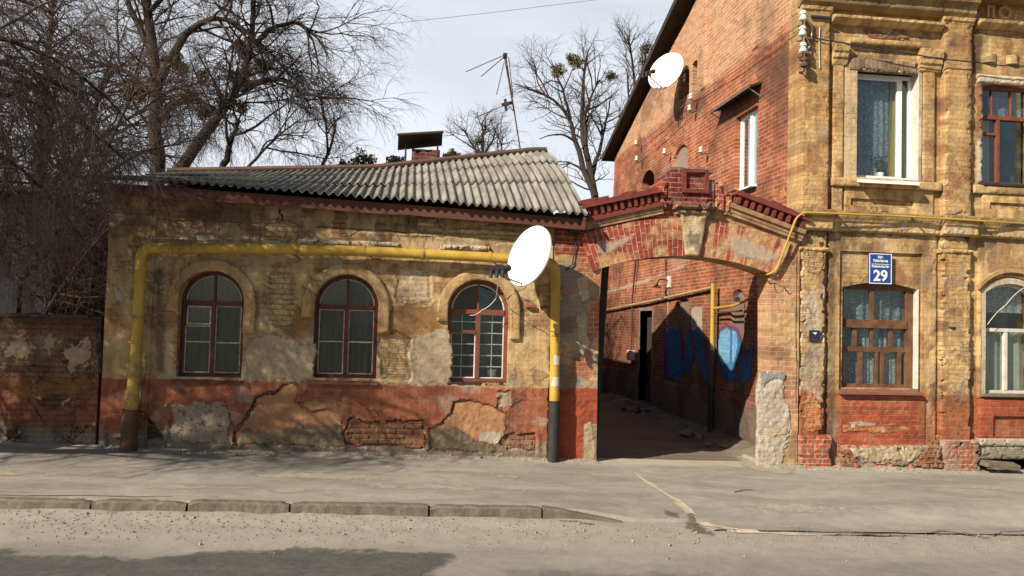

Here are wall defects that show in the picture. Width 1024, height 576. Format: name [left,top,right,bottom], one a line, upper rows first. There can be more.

spalling [803,246,824,274]
crack [225,385,301,443]
flaking render [138,383,535,453]
flaking render [755,371,791,465]
spalling [803,392,822,432]
spalling [837,447,860,468]
spalling [908,434,944,470]